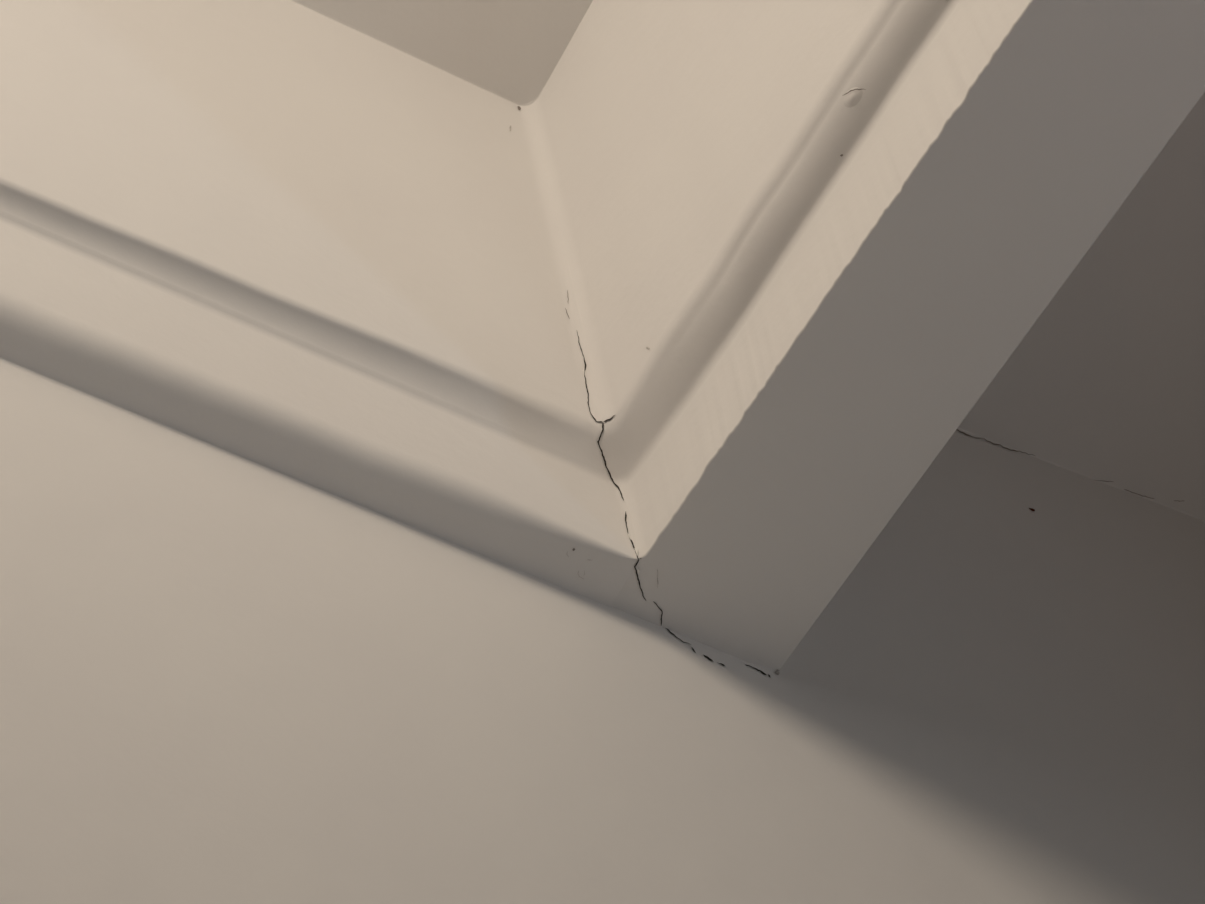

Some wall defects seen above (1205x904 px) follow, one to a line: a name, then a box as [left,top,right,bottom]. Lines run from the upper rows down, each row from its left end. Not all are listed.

crack [565,291,780,677]
crack [957,429,1035,456]